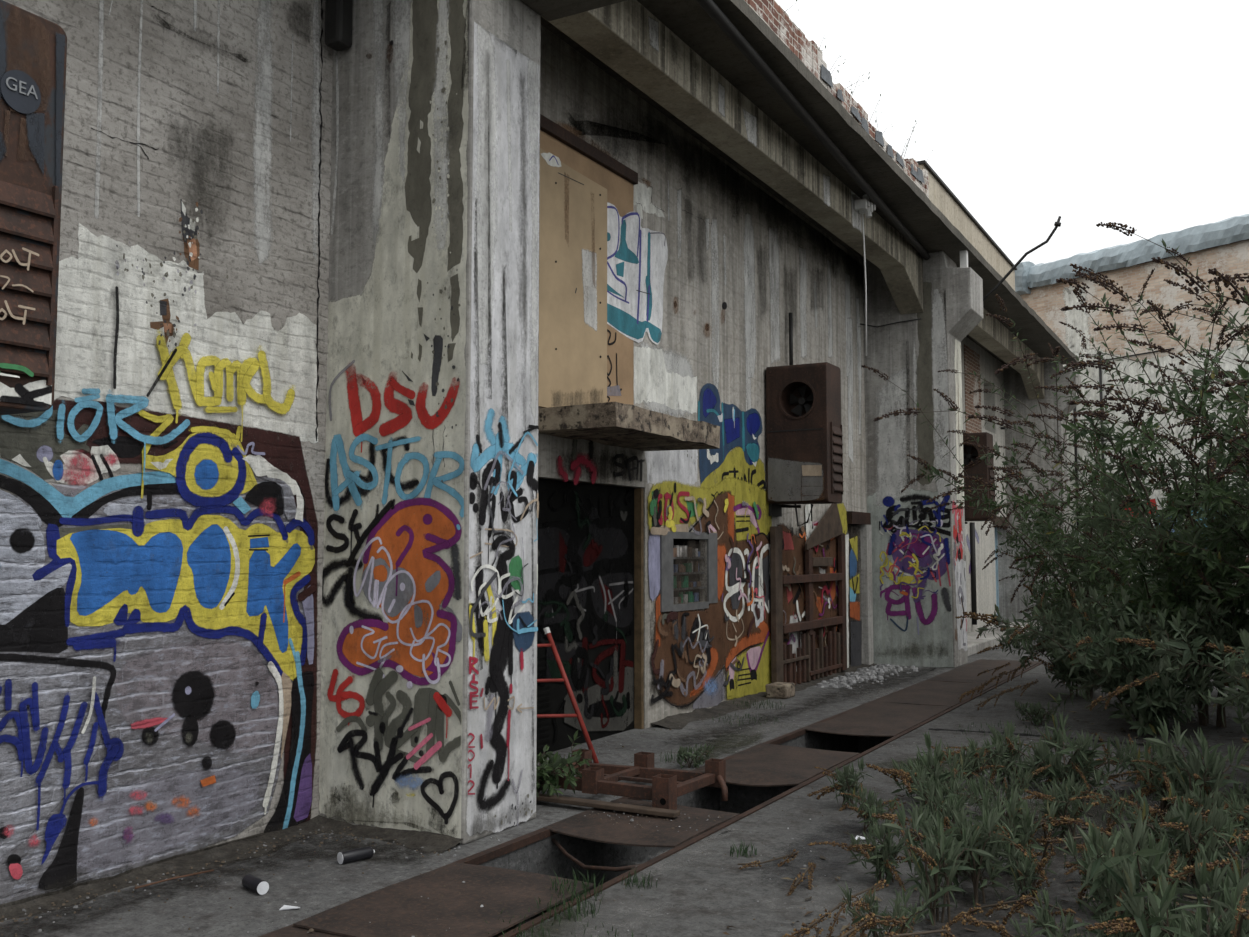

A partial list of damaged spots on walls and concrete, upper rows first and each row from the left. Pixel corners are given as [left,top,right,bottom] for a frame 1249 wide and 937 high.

water stain [743,109,757,146]
peeling [405,0,466,396]
spalling [180,199,200,271]
spalling [150,299,174,344]
water stain [570,116,863,462]